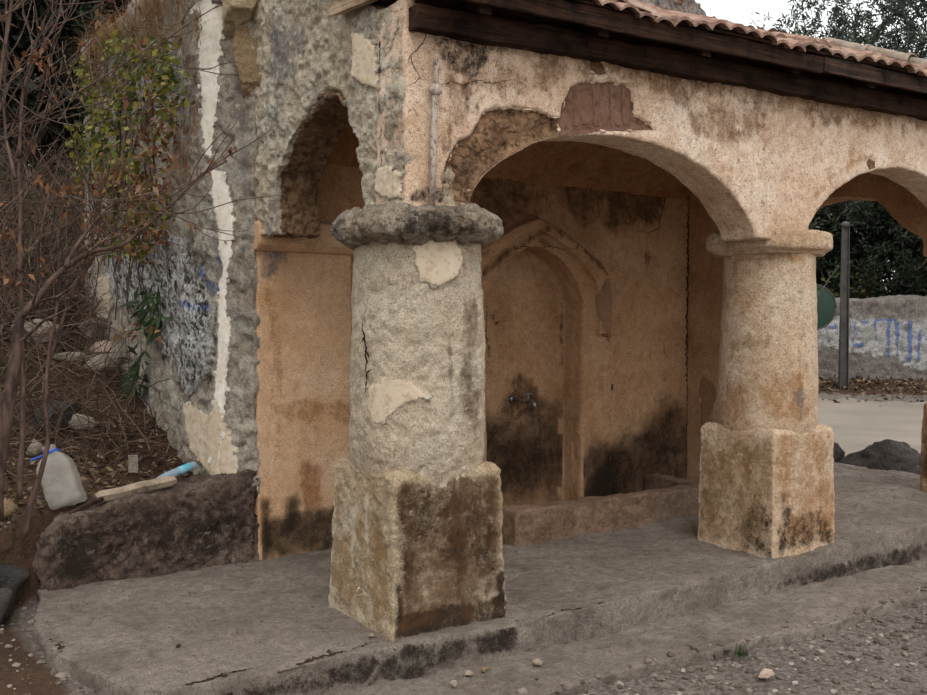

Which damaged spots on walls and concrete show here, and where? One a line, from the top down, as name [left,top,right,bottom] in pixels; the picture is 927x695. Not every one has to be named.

spalling [442,62,653,204]
peeling [412,240,463,288]
crack [361,323,374,394]
peeling [366,376,432,426]
water stain [583,408,687,497]
water stain [226,357,562,695]
water stain [698,442,832,557]
water stain [784,546,921,585]